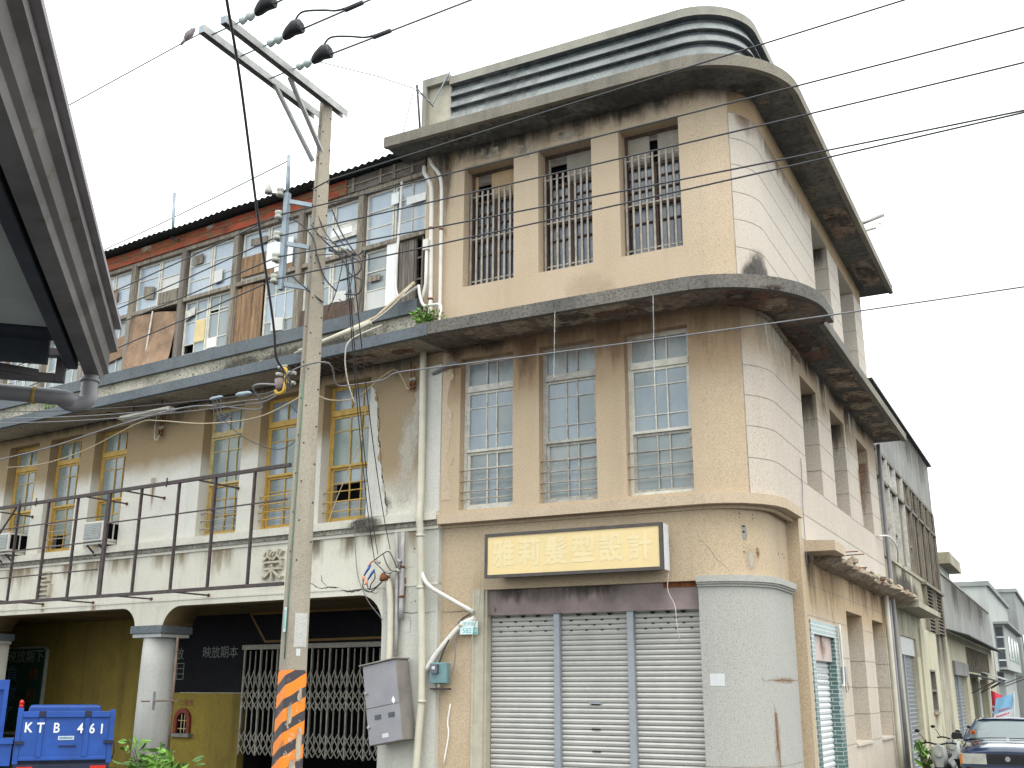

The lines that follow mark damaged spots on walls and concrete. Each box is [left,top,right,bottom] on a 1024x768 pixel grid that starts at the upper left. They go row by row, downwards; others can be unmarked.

peeling [365,387,388,517]
peeling [440,353,454,501]
crack [311,577,379,593]
leakage [348,517,380,539]